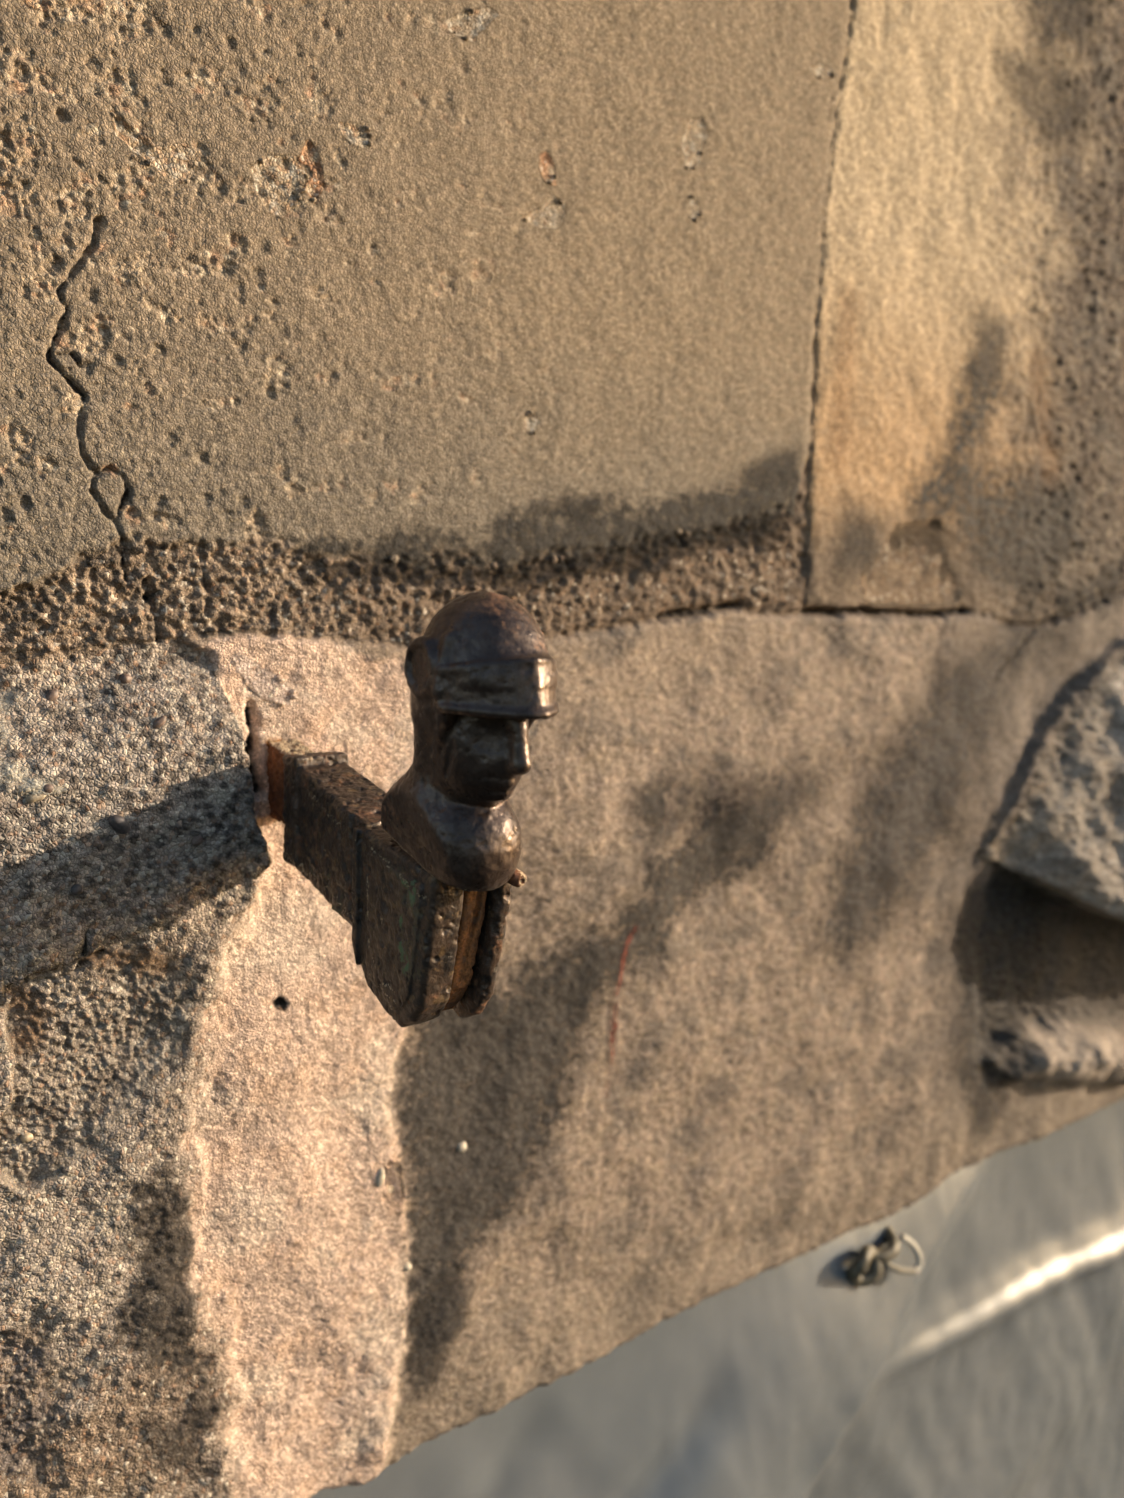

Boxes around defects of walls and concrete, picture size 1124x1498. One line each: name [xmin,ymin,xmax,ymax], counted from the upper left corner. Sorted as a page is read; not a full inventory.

crack [46,289,85,401]
crack [118,484,129,514]
crack [122,557,154,600]
leakage [814,311,1124,981]
leakage [386,771,829,1398]